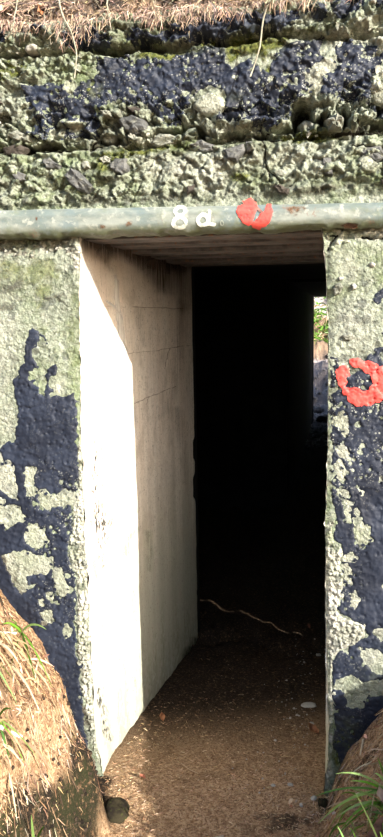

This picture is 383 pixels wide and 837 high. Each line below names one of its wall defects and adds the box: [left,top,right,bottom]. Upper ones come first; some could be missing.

crack [225,134,312,183]
crack [335,119,383,149]
spalling [0,434,102,768]
spalling [325,410,383,782]